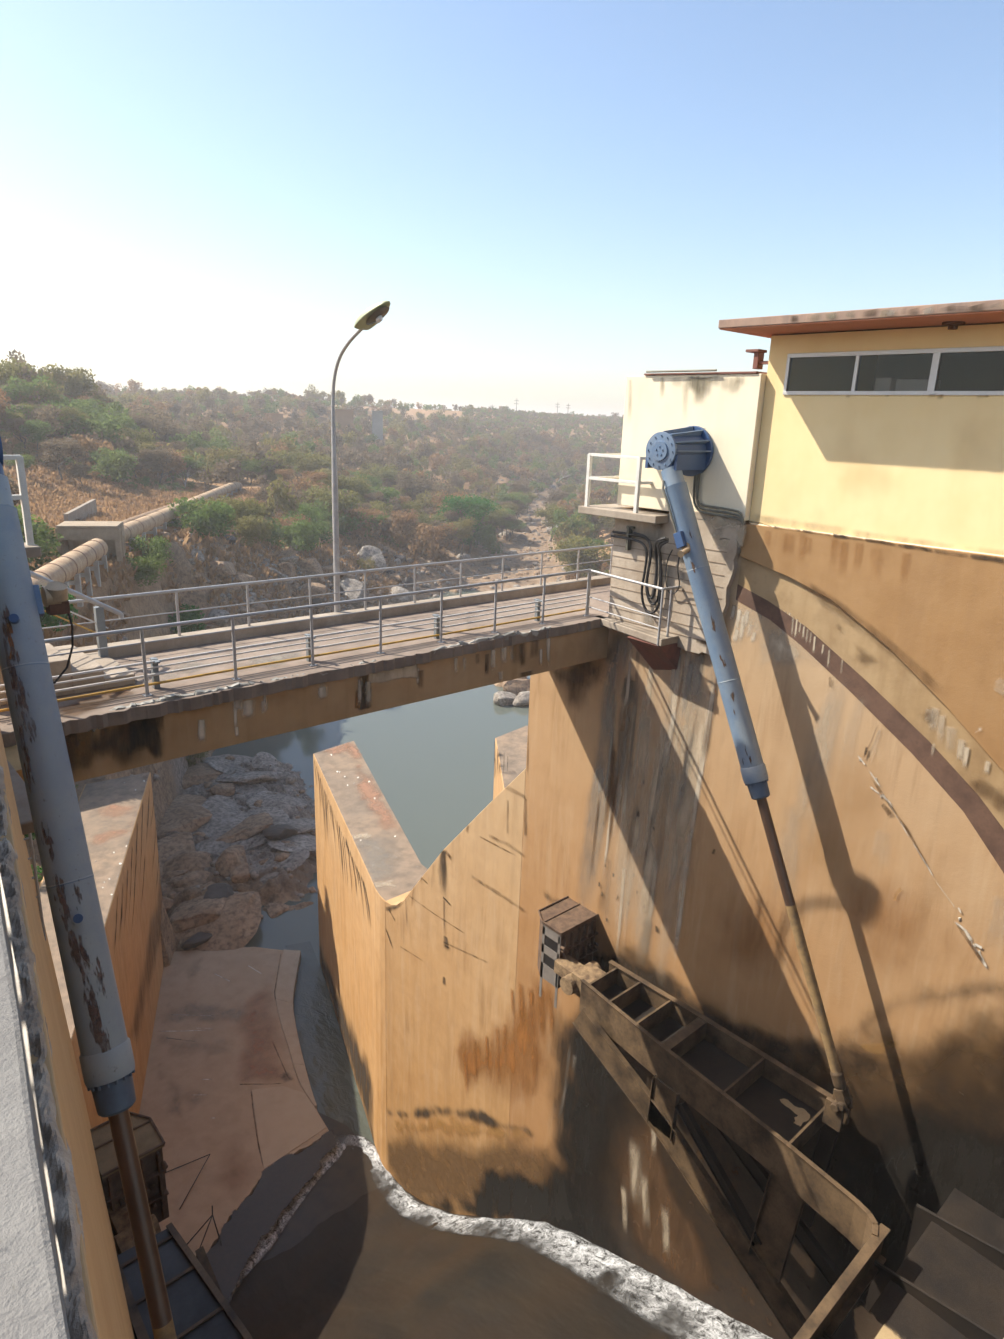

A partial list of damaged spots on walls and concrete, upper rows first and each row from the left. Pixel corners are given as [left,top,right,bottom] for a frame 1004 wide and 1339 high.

water stain [560,639,714,951]
crack [858,747,987,967]
rust [458,985,553,1088]
water stain [593,951,789,1053]
water stain [805,1042,826,1059]
water stain [395,1109,498,1137]
water stain [622,1150,646,1210]